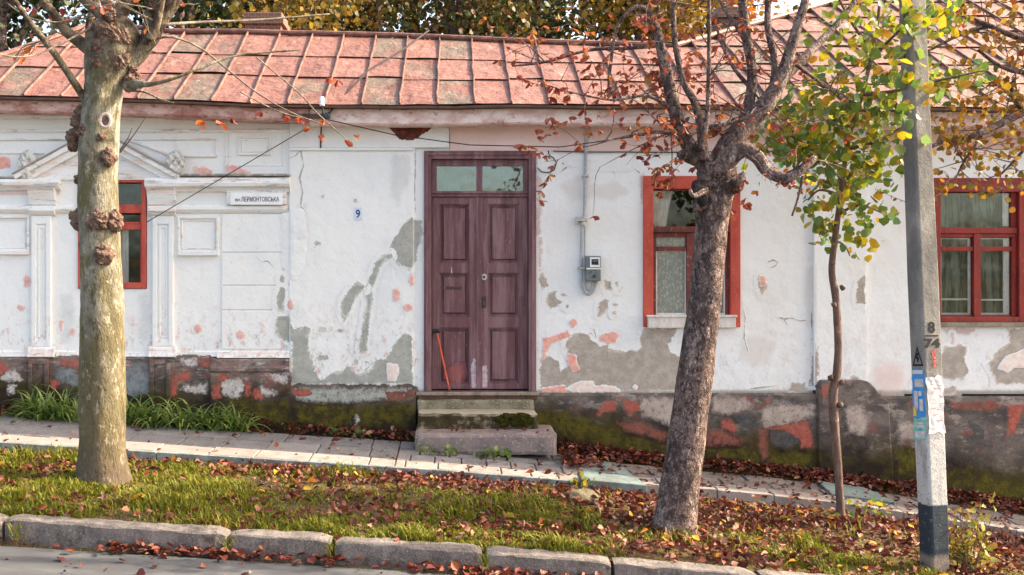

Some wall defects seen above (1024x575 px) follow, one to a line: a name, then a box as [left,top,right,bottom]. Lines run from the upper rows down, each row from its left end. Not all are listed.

flaking render [851,271,870,310]
flaking render [171,211,424,427]
peeling [0,358,27,399]
flaking render [49,355,79,394]
flaking render [126,358,149,401]
flaking render [536,265,682,445]
flaking render [941,327,1024,442]
water stain [732,410,800,453]